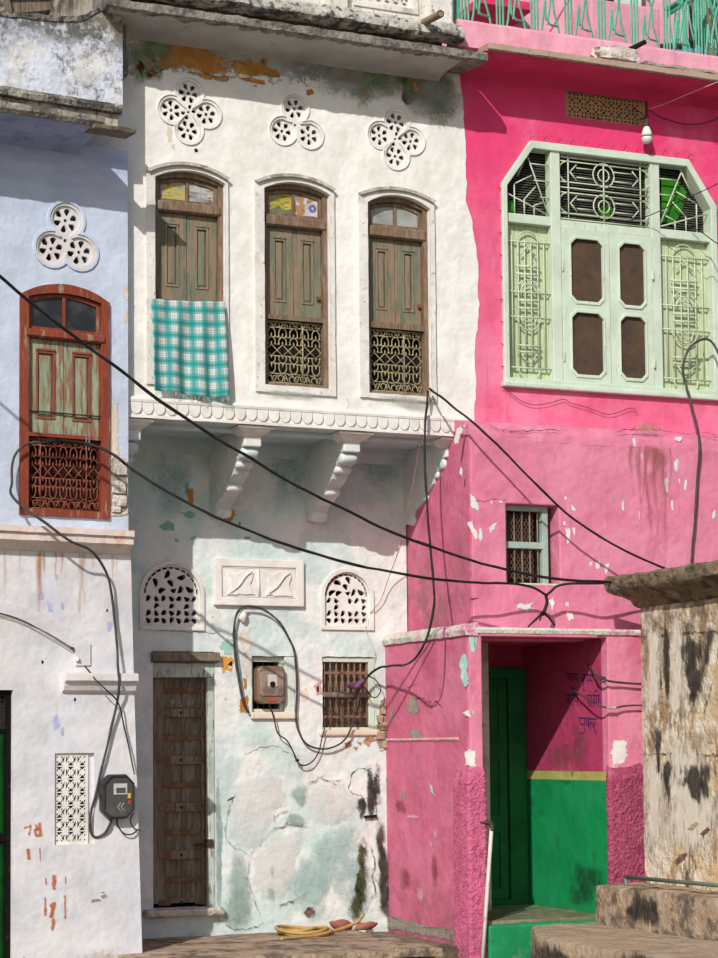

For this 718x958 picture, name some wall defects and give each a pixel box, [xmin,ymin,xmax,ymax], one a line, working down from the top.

peeling [128,39,330,96]
peeling [664,459,687,511]
peeling [467,521,498,541]
peeling [459,635,478,687]
damp [645,622,718,720]
spalling [406,697,420,715]
crack [310,768,371,796]
damp [357,769,380,818]
peeling [465,748,476,767]
damp [644,728,718,854]
crack [219,796,308,930]
damp [291,824,389,919]